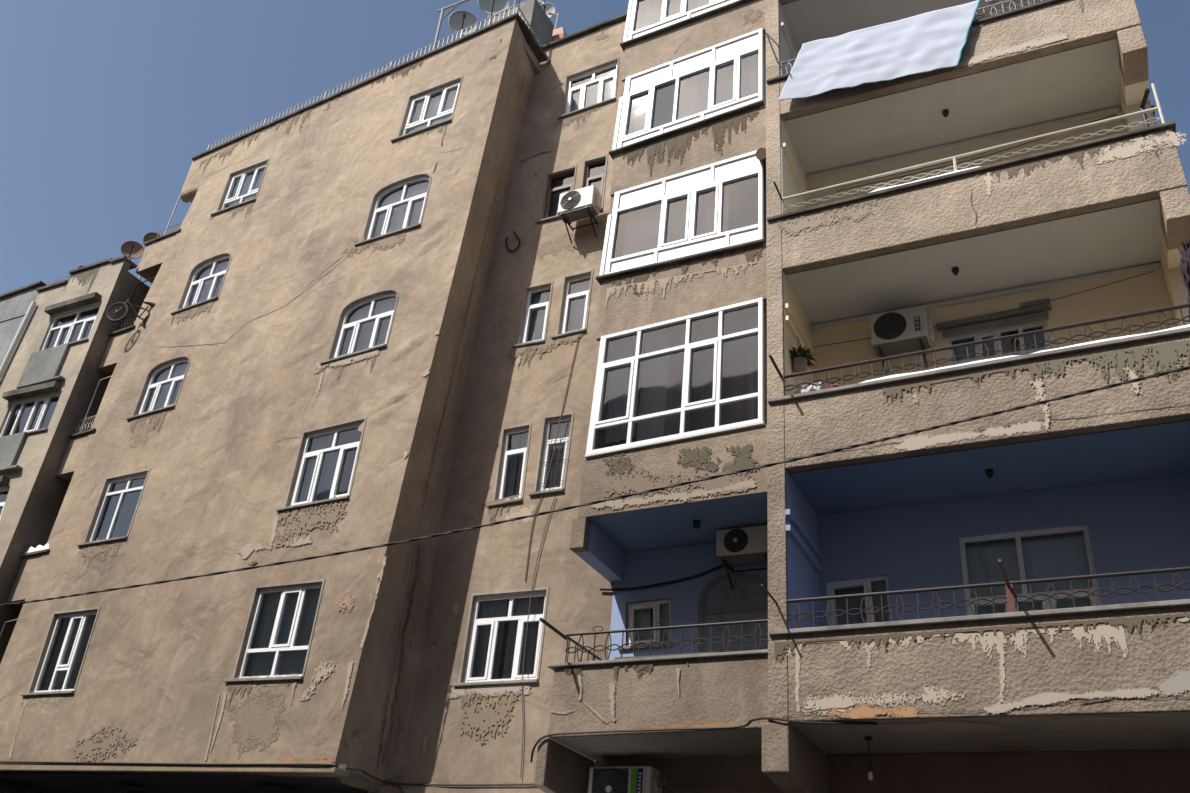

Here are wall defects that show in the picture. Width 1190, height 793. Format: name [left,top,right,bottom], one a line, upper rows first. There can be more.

water stain [622,106,760,177]
spalling [591,478,756,510]